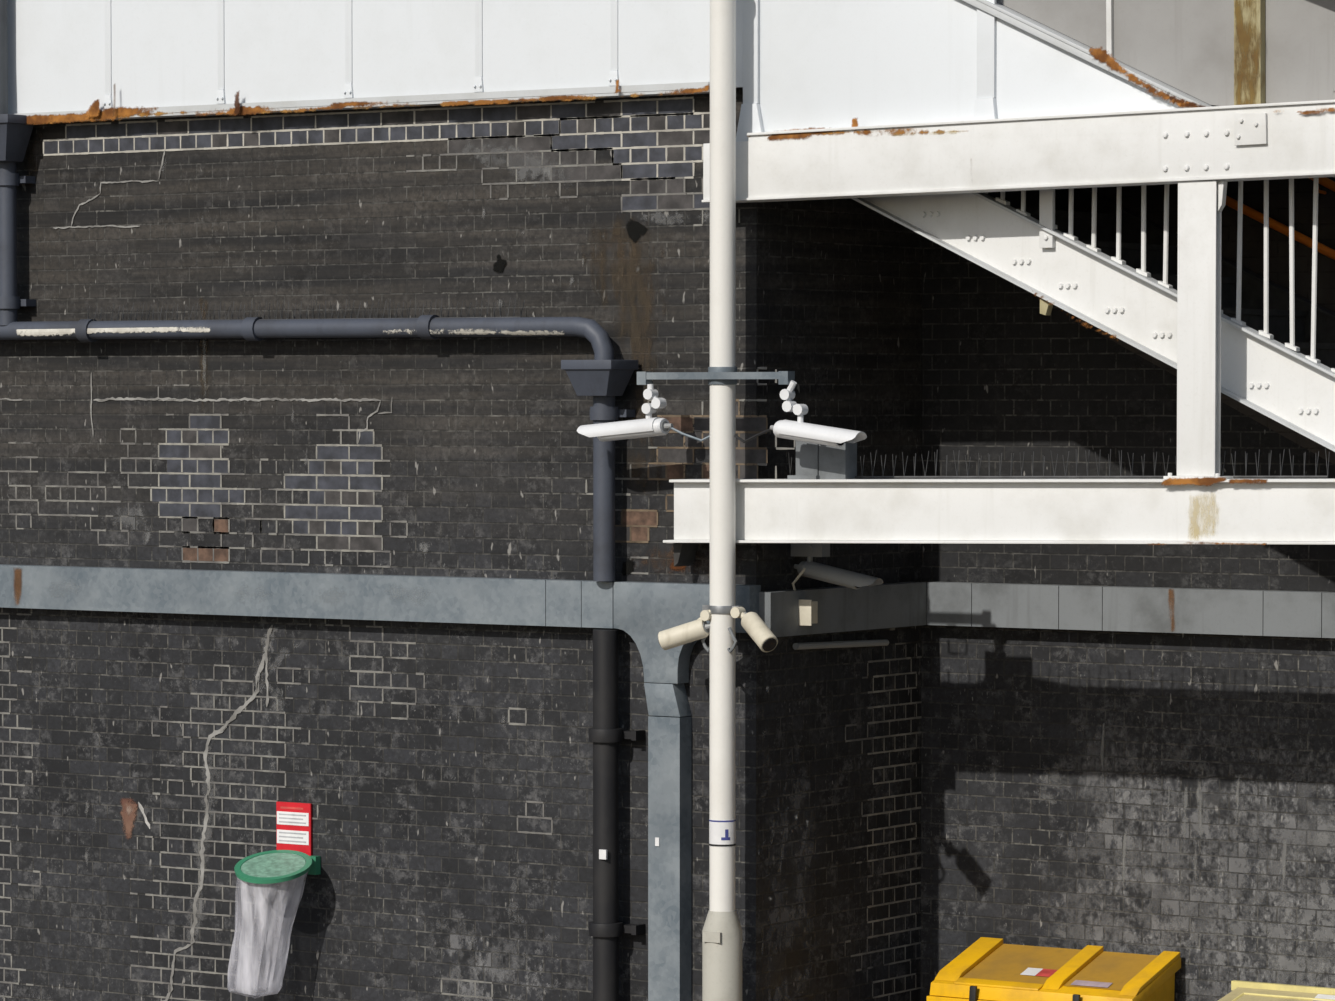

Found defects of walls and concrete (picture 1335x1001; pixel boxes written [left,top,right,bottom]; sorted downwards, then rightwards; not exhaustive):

rust [27,84,407,125]
rust [441,95,596,106]
rust [660,85,709,95]
rust [1089,47,1205,108]
rust [1235,0,1260,105]
crack [163,625,277,1001]